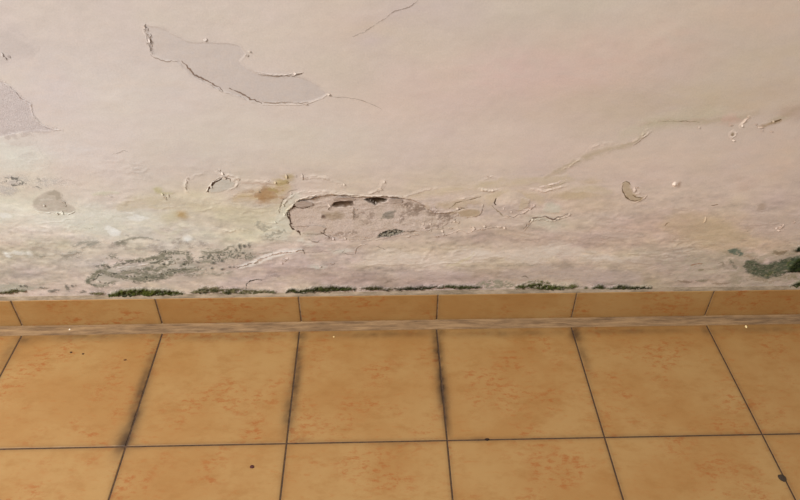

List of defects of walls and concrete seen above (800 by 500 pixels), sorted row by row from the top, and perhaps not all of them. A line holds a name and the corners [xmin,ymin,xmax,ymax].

peeling [142,24,330,106]
peeling [0,79,64,140]
peeling [30,188,76,215]
water stain [0,137,282,294]
peeling [206,169,241,194]
spalling [207,177,506,269]
water stain [289,201,800,289]